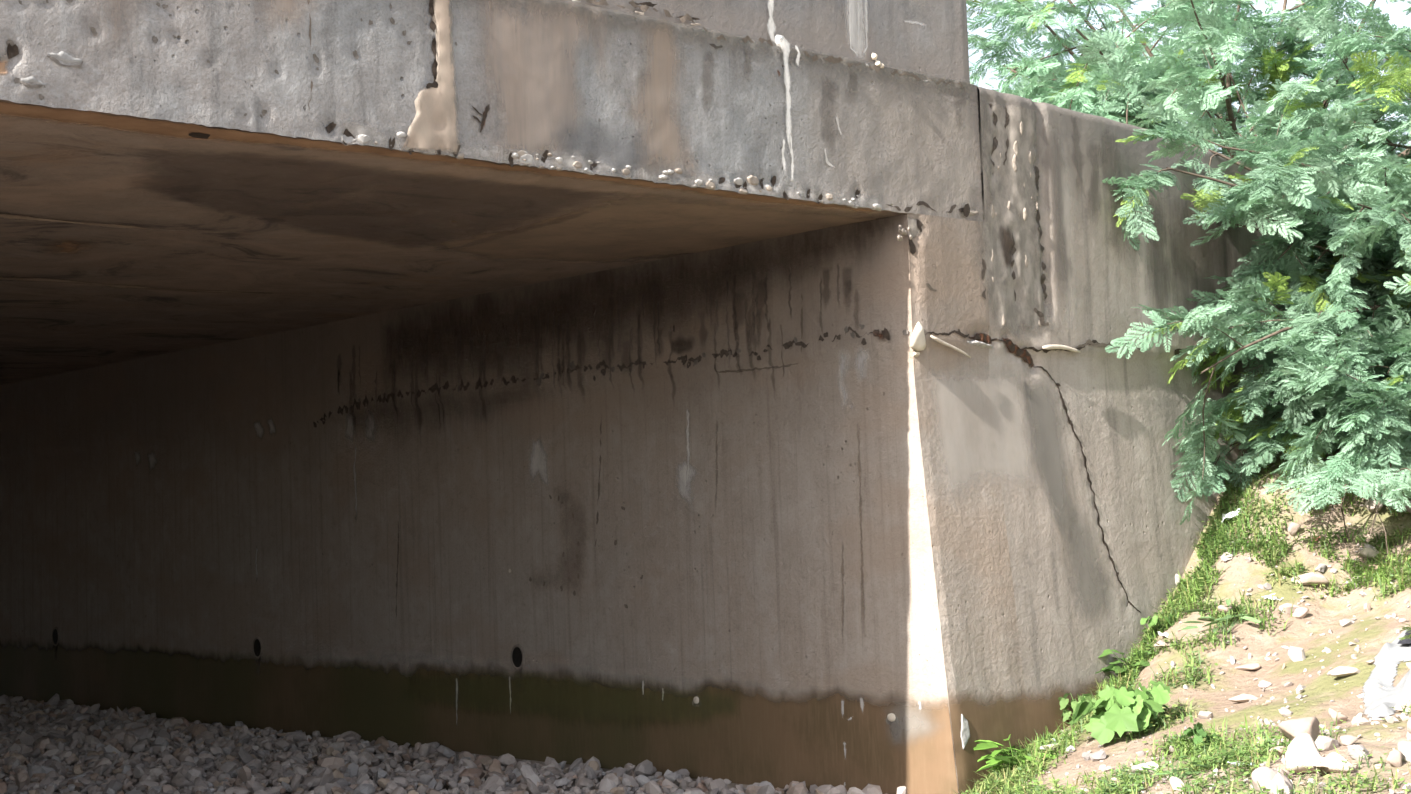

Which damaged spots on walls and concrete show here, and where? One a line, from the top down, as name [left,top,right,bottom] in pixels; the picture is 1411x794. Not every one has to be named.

flaking render [325,0,882,211]
damp [644,0,802,179]
damp [148,157,877,366]
spalling [897,217,923,254]
crack [313,294,1182,617]
damp [0,638,1109,794]